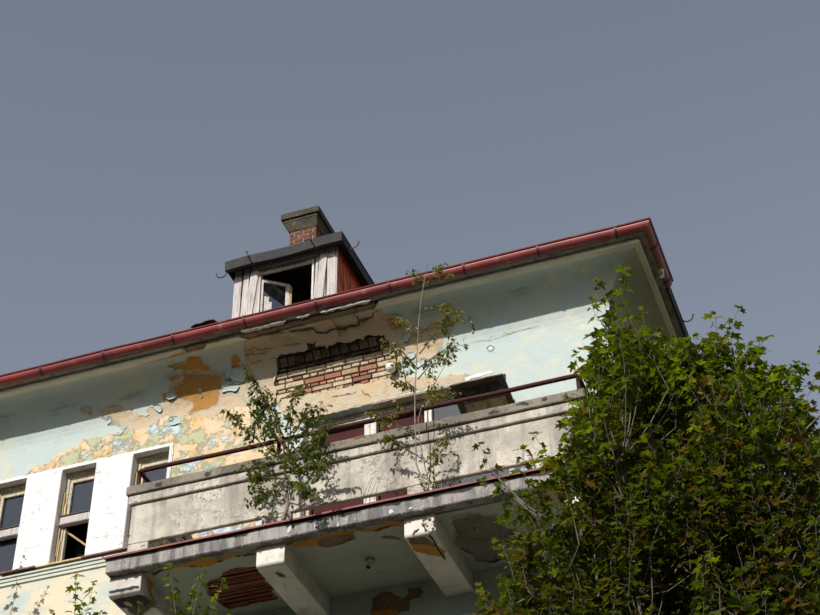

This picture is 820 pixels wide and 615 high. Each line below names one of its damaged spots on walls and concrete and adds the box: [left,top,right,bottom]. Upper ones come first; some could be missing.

crack [245,310,380,364]
peeling [25,308,493,477]
peeling [191,520,262,539]
peeling [275,504,446,559]
spalling [450,512,510,563]
spalling [147,542,278,609]
peeling [369,586,426,615]